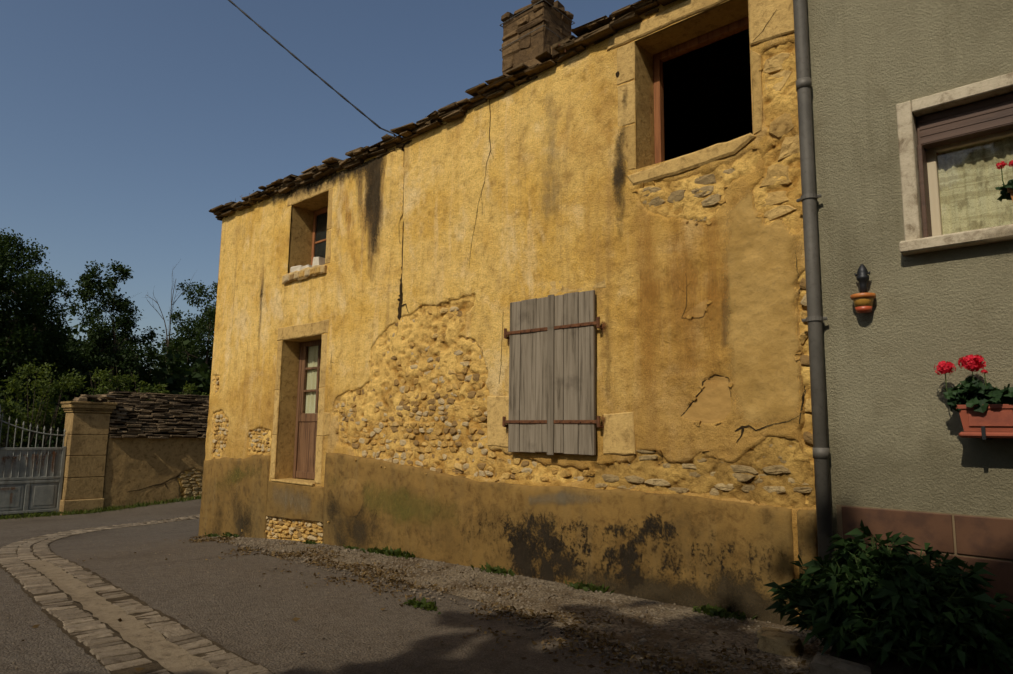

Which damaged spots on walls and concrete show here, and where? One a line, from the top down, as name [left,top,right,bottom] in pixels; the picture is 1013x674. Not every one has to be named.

damp [272,156,383,264]
crack [394,136,412,320]
crack [469,100,493,265]
damp [613,136,625,211]
spalling [633,147,766,225]
spalling [210,410,229,458]
spalling [246,426,272,455]
spalling [333,271,816,509]
crack [681,374,731,416]
crack [735,385,806,443]
spalling [177,469,203,500]
damp [469,514,793,627]